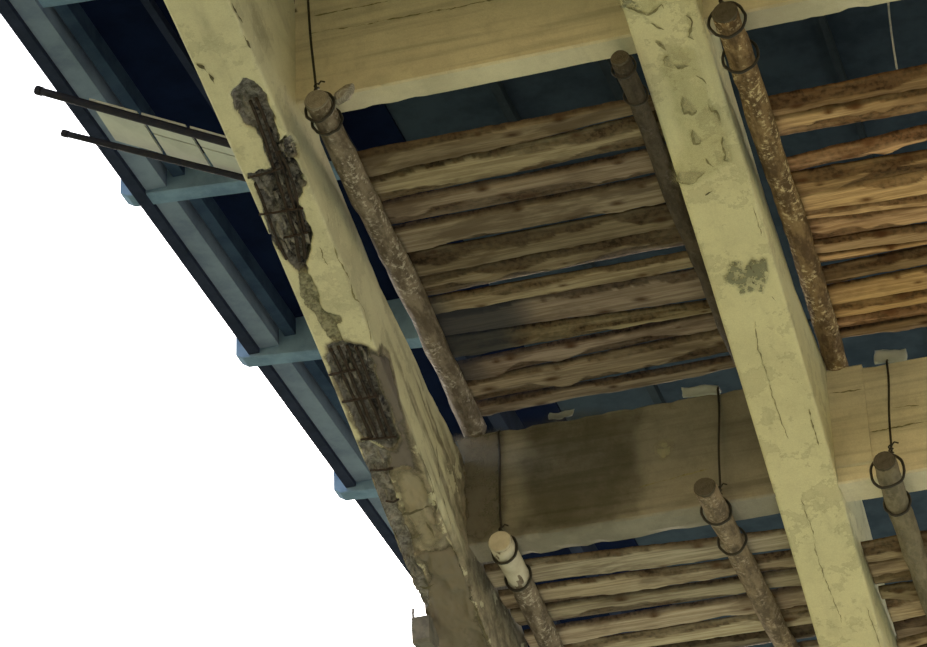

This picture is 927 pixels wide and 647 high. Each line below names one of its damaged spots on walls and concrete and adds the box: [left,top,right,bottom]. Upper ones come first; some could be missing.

peeling [622,0,664,30]
peeling [725,258,768,294]
spalling [231,78,490,647]
crack [755,322,788,437]
crack [801,500,842,623]